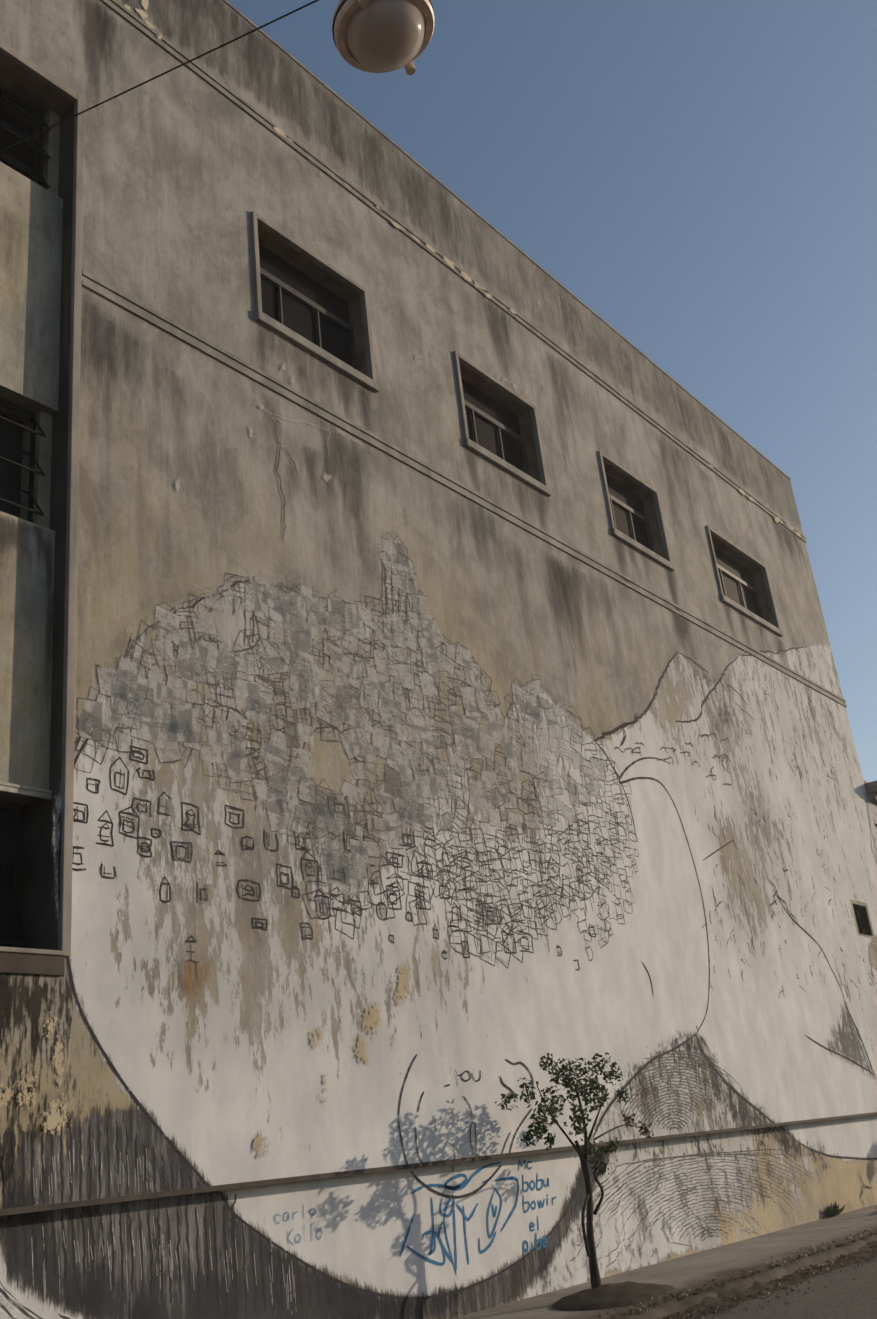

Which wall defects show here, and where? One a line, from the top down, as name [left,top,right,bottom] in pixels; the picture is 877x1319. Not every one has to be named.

damp [85,2,108,78]
damp [667,569,684,635]
peeling [866,795,877,860]
peeling [352,963,412,1066]
peeling [0,1010,73,1136]